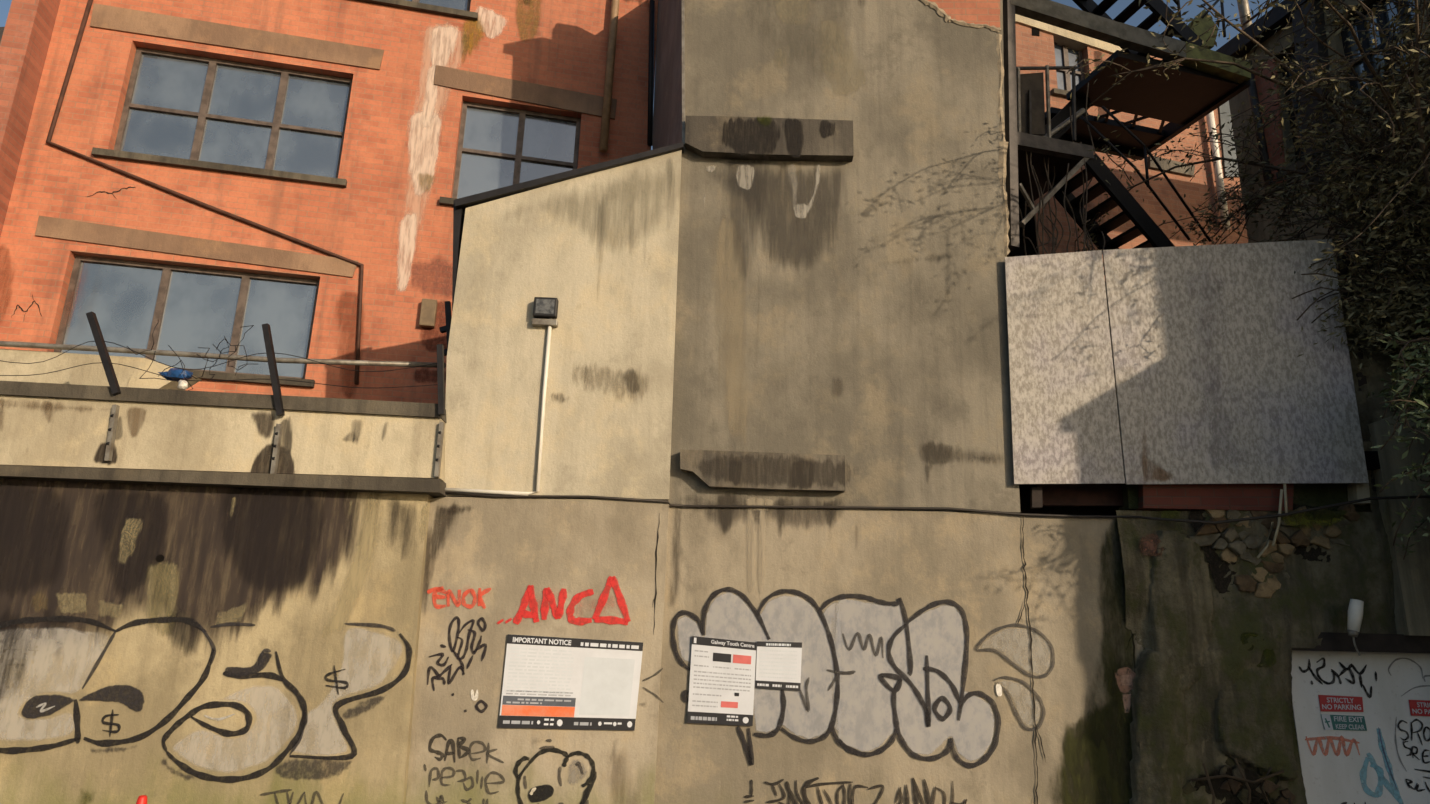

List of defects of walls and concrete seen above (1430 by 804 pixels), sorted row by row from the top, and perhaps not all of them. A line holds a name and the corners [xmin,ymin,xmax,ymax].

leakage [478,7,505,38]
crack [87,186,136,198]
leakage [398,25,465,350]
leakage [737,118,840,264]
spalling [920,0,1010,255]
leakage [96,491,166,592]
leakage [225,413,322,589]
leakage [424,507,464,594]
leakage [696,461,836,592]
spalling [1187,484,1360,599]
leakage [169,615,197,650]
crack [1017,518,1046,804]